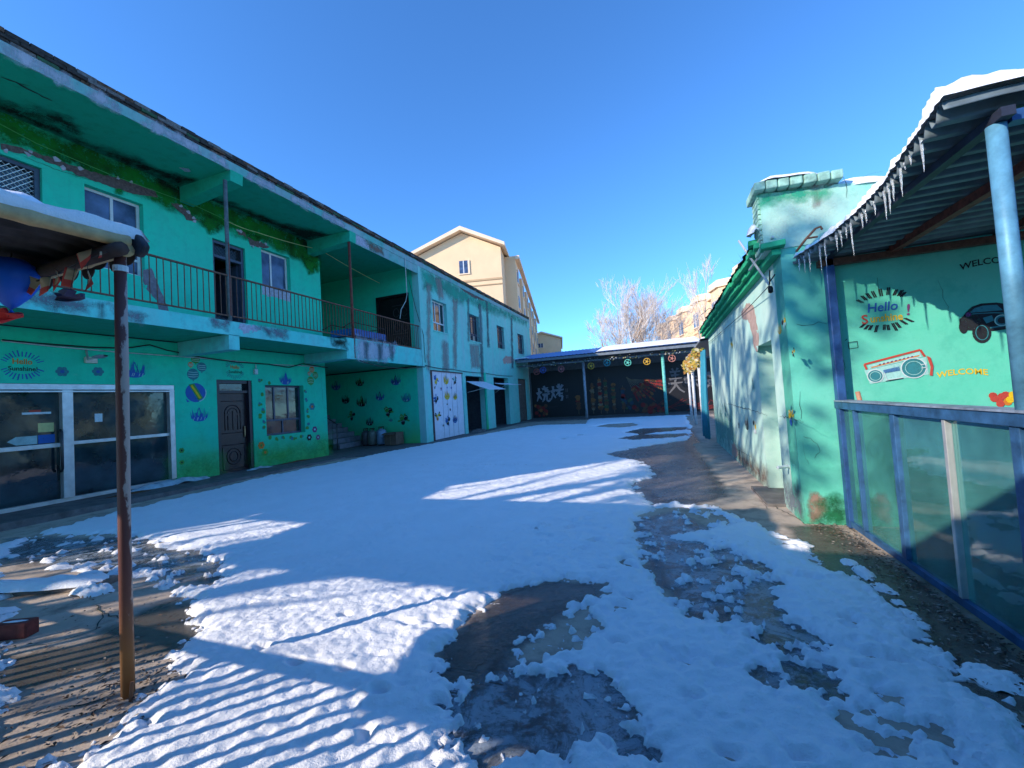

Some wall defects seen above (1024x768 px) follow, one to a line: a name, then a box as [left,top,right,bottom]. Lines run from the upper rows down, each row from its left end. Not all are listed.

flaking render [1,144,158,197]
damp [0,103,329,274]
flaking render [171,203,201,223]
peeling [143,267,169,311]
damp [423,273,524,382]